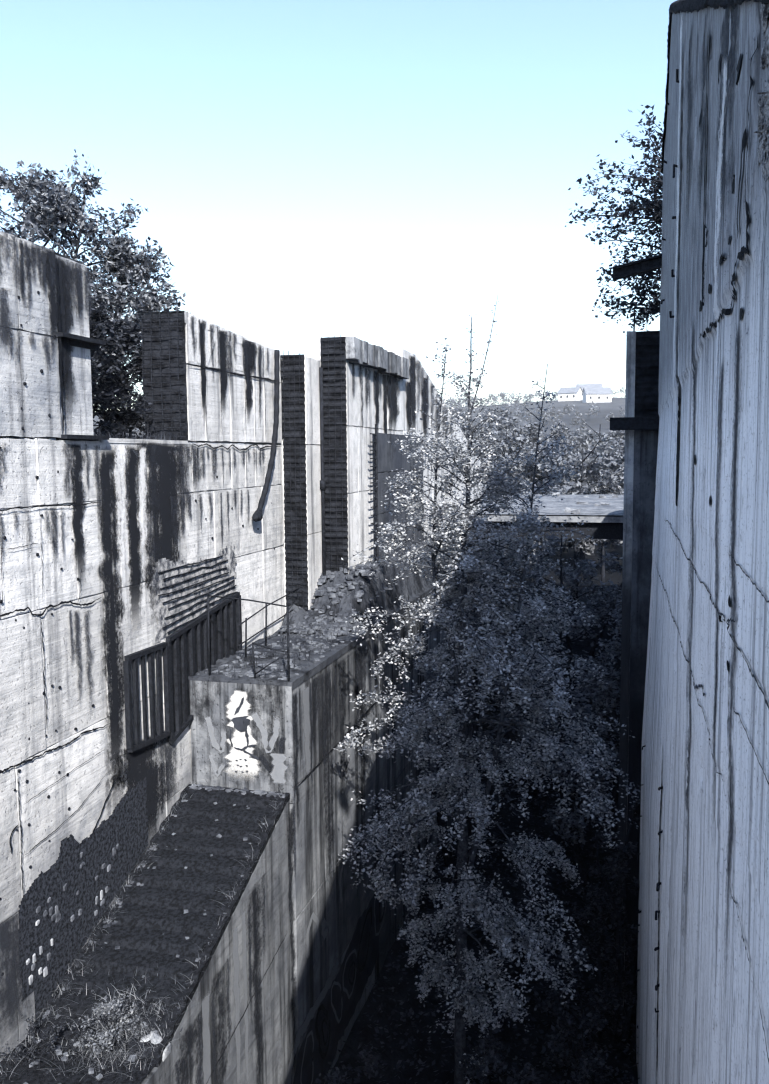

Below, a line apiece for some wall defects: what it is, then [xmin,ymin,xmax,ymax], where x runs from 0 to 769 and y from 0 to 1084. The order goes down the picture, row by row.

spalling [754,3,769,182]
leakage [0,233,91,397]
leakage [191,316,269,416]
leakage [352,356,454,446]
crack [666,36,769,709]
crack [0,502,117,899]
leakage [45,442,265,833]
spalling [149,544,238,644]
leakage [287,640,372,1047]
crack [656,567,727,802]
crack [734,711,769,785]
leakage [175,874,266,1084]